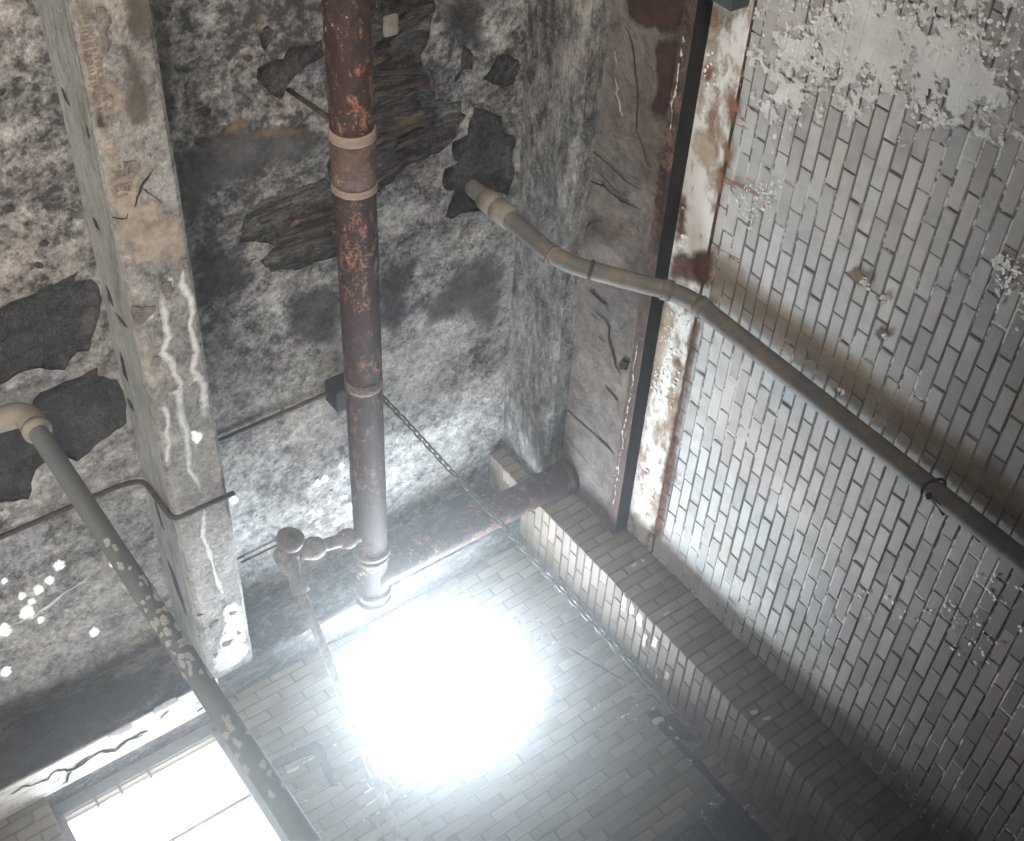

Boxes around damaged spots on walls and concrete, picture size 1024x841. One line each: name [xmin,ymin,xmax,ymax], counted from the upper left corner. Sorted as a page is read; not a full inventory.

crack [112,172,162,219]
spalling [370,0,520,219]
crack [591,25,651,210]
corrosion [627,0,684,116]
corrosion [693,132,758,195]
corrosion [728,99,747,129]
peeling [740,0,1024,154]
corrosion [670,247,741,286]
spalling [0,271,127,462]
water stain [149,272,208,487]
spalling [0,429,45,503]
crack [12,711,168,795]